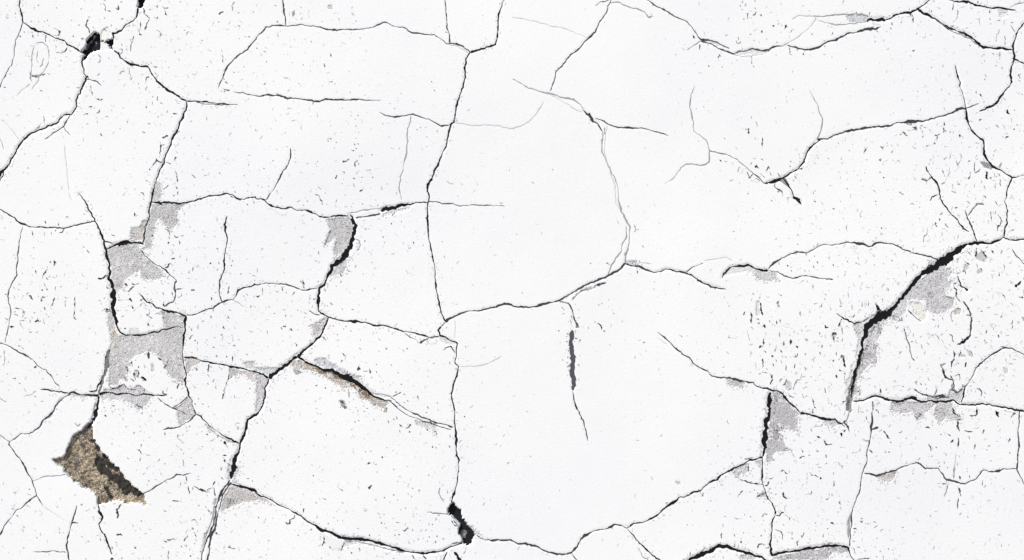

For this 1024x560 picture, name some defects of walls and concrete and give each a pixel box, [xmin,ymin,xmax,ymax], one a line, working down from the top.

crack [0,0,117,179]
peeling [108,168,186,291]
peeling [286,206,410,335]
peeling [49,311,201,418]
peeling [840,252,988,413]
spalling [53,423,156,506]
crack [33,495,122,560]